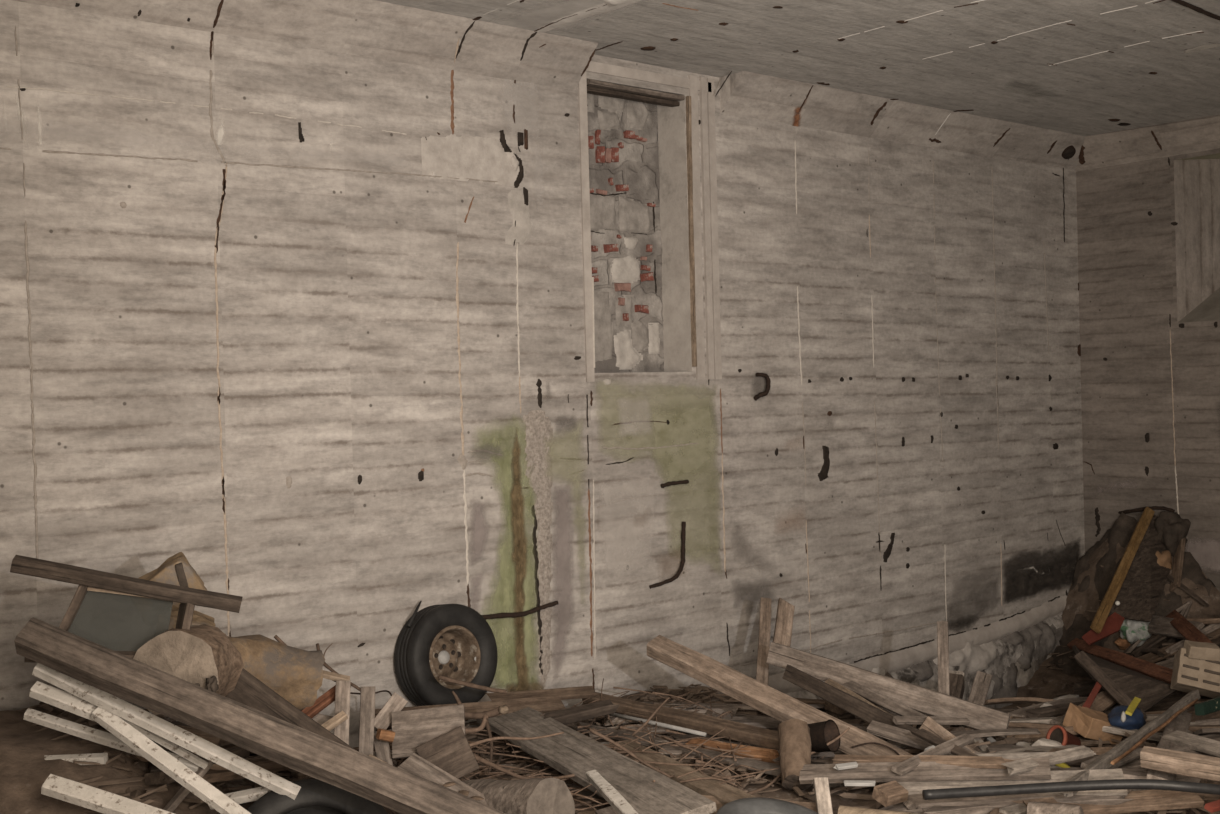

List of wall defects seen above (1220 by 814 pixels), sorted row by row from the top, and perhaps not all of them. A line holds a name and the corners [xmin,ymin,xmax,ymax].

crack [512,4,607,152]
crack [0,0,524,637]
crack [514,220,727,691]
corrosion [507,438,543,692]
water stain [554,490,571,669]
crack [727,624,757,666]
water stain [948,543,1080,629]